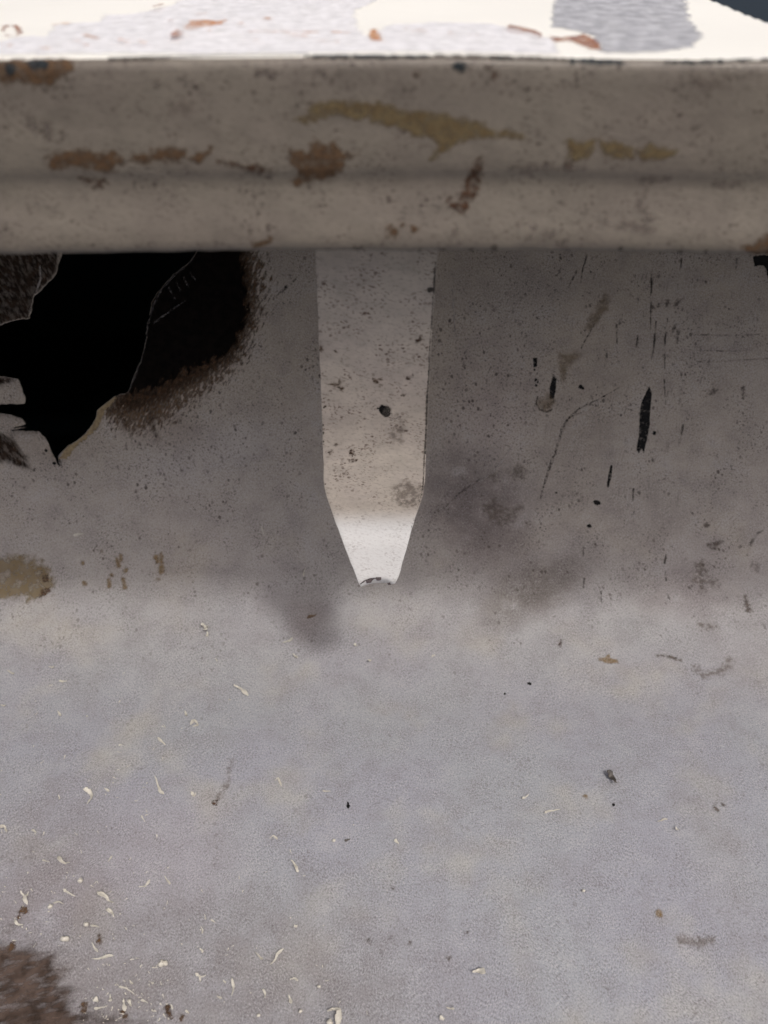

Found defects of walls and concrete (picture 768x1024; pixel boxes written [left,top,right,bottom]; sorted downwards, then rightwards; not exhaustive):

peeling [0,0,768,86]
corrosion [45,146,271,188]
corrosion [288,138,351,187]
corrosion [445,156,484,214]
crack [541,389,616,492]